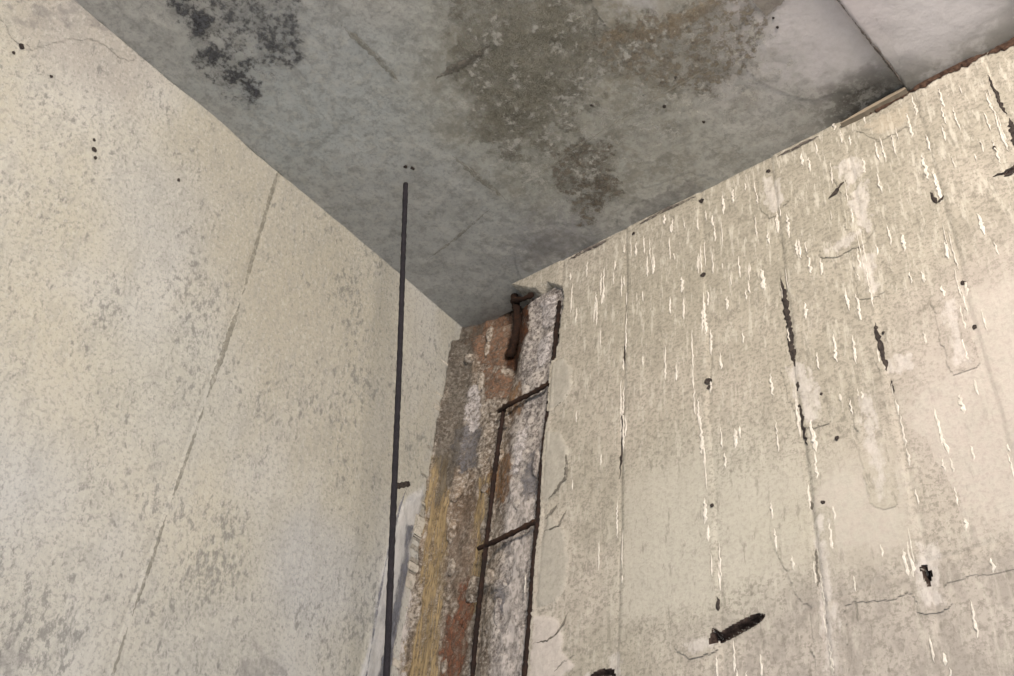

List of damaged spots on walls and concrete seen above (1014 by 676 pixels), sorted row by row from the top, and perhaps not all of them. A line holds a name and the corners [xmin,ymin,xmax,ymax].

damp [168,0,304,103]
crack [837,0,1014,177]
damp [513,139,624,279]
rust [465,300,534,421]
crack [780,278,808,446]
crack [874,323,895,392]
spalling [398,287,580,676]
damp [769,333,927,676]
damp [570,644,627,676]
spalling [591,668,616,676]
spalling [709,613,765,645]
damp [902,530,953,614]